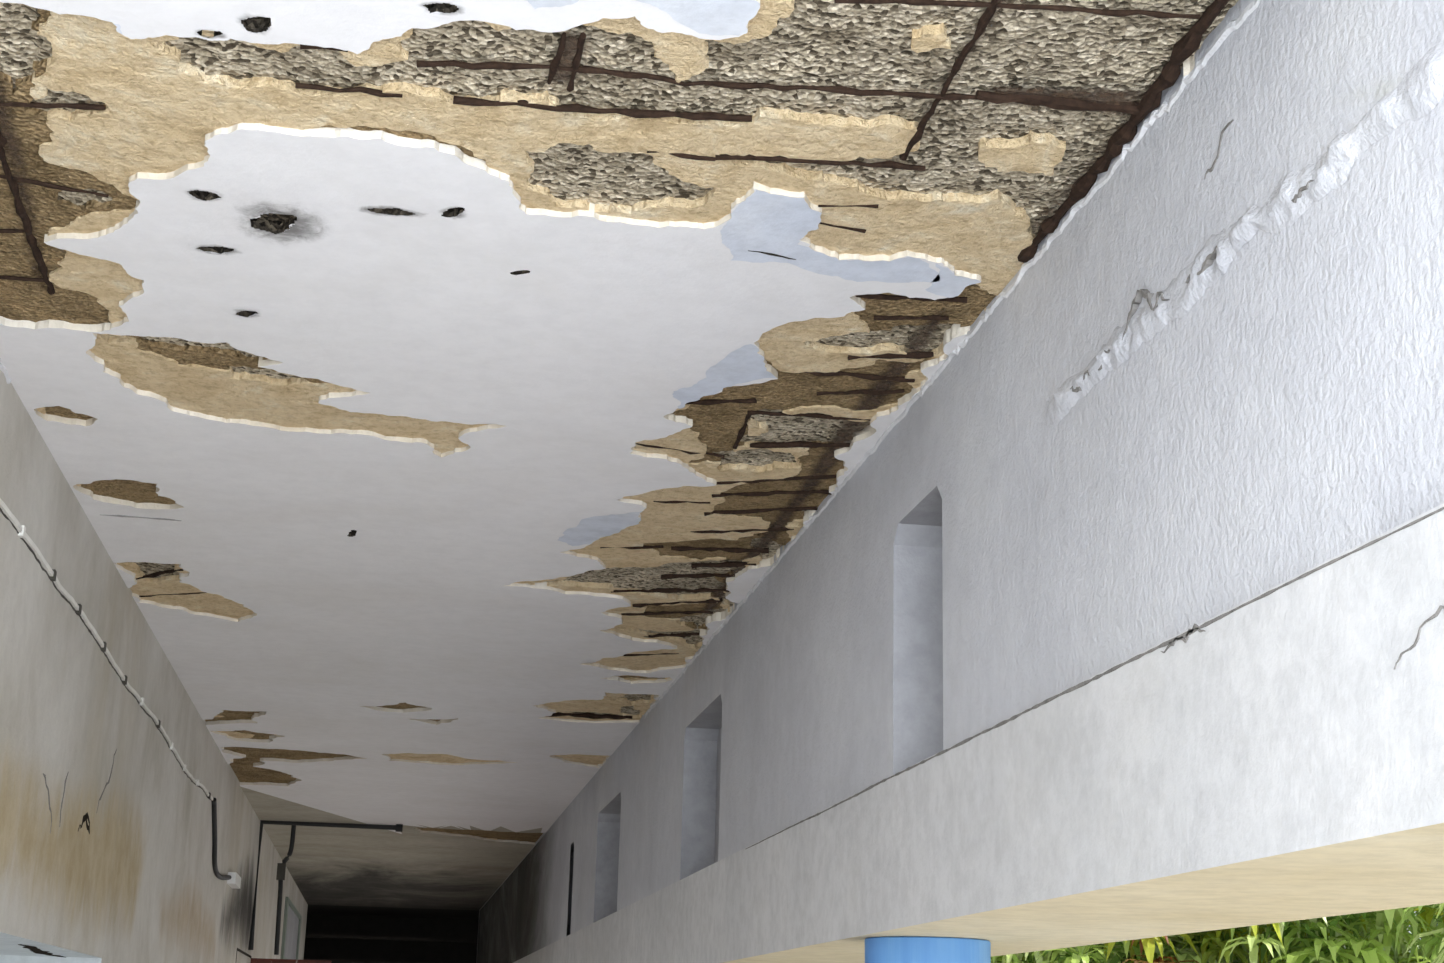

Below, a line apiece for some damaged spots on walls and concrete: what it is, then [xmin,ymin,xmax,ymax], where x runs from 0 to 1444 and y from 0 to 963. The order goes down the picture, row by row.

corrosion [551,35,585,84]
corrosion [994,88,1139,113]
spalling [0,0,1261,725]
crack [746,507,1444,849]
leakage [0,687,219,963]